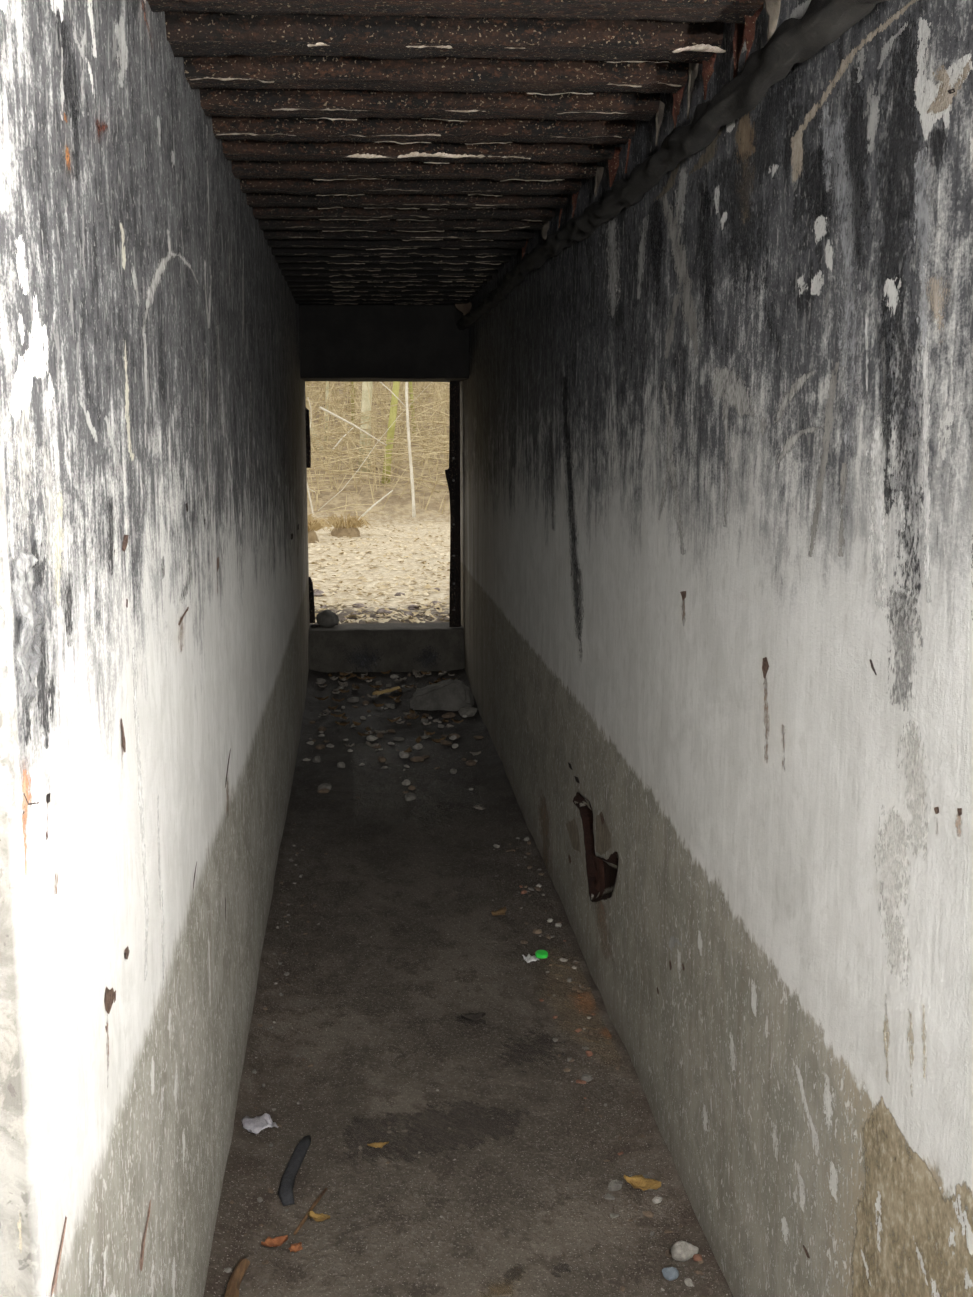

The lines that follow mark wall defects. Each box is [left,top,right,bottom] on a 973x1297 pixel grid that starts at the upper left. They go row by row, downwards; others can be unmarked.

corrosion [655,53,717,145]
corrosion [733,0,781,78]
spalling [856,17,973,155]
corrosion [521,139,631,260]
corrosion [726,112,757,224]
peeling [9,234,64,607]
damp [790,67,949,705]
damp [107,497,116,574]
damp [548,376,584,656]
damp [64,573,73,646]
damp [23,693,32,746]
corrosion [20,768,32,876]